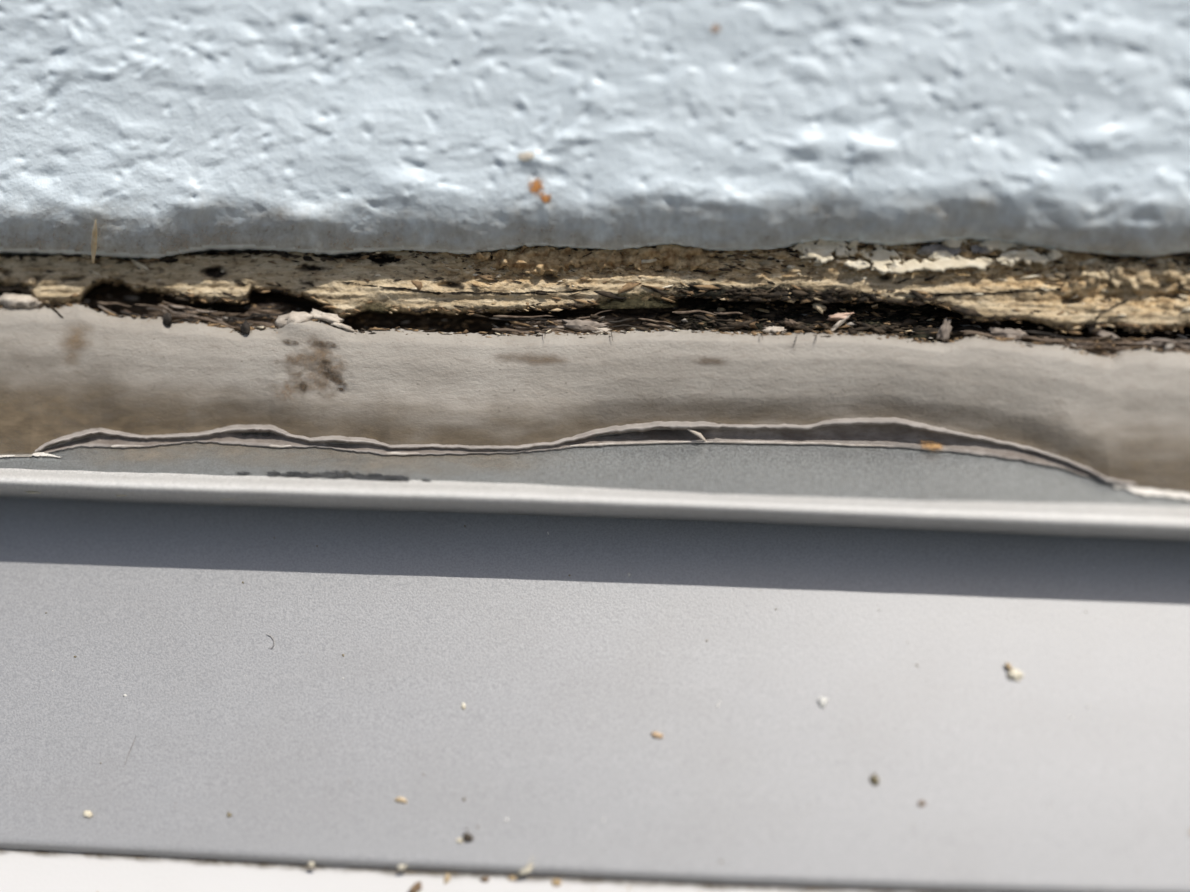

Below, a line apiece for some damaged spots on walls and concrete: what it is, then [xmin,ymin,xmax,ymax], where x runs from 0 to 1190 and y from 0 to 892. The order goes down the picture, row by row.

spalling [473,244,720,276]
spalling [790,238,1190,291]
leakage [283,341,346,392]